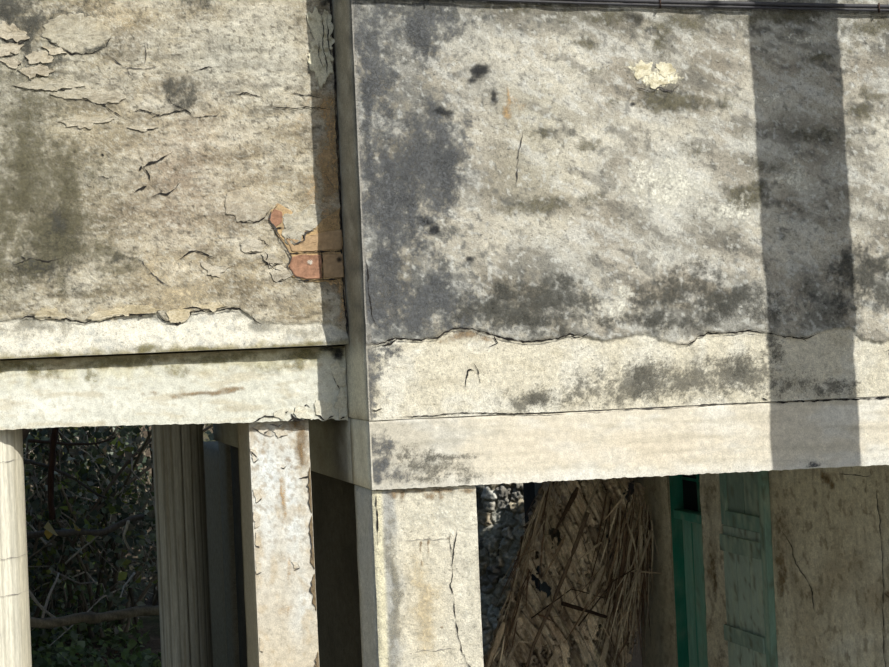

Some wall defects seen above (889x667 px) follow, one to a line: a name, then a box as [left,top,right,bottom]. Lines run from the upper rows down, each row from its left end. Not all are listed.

flaking render [0,13,126,105]
flaking render [307,0,335,89]
flaking render [629,60,680,92]
crack [237,0,343,254]
crack [134,152,178,197]
crack [126,307,261,324]
spalling [224,187,344,283]
crack [365,259,588,346]
leakage [353,0,778,420]
leakage [805,237,889,320]
leakage [510,331,860,411]
leakage [372,437,476,498]